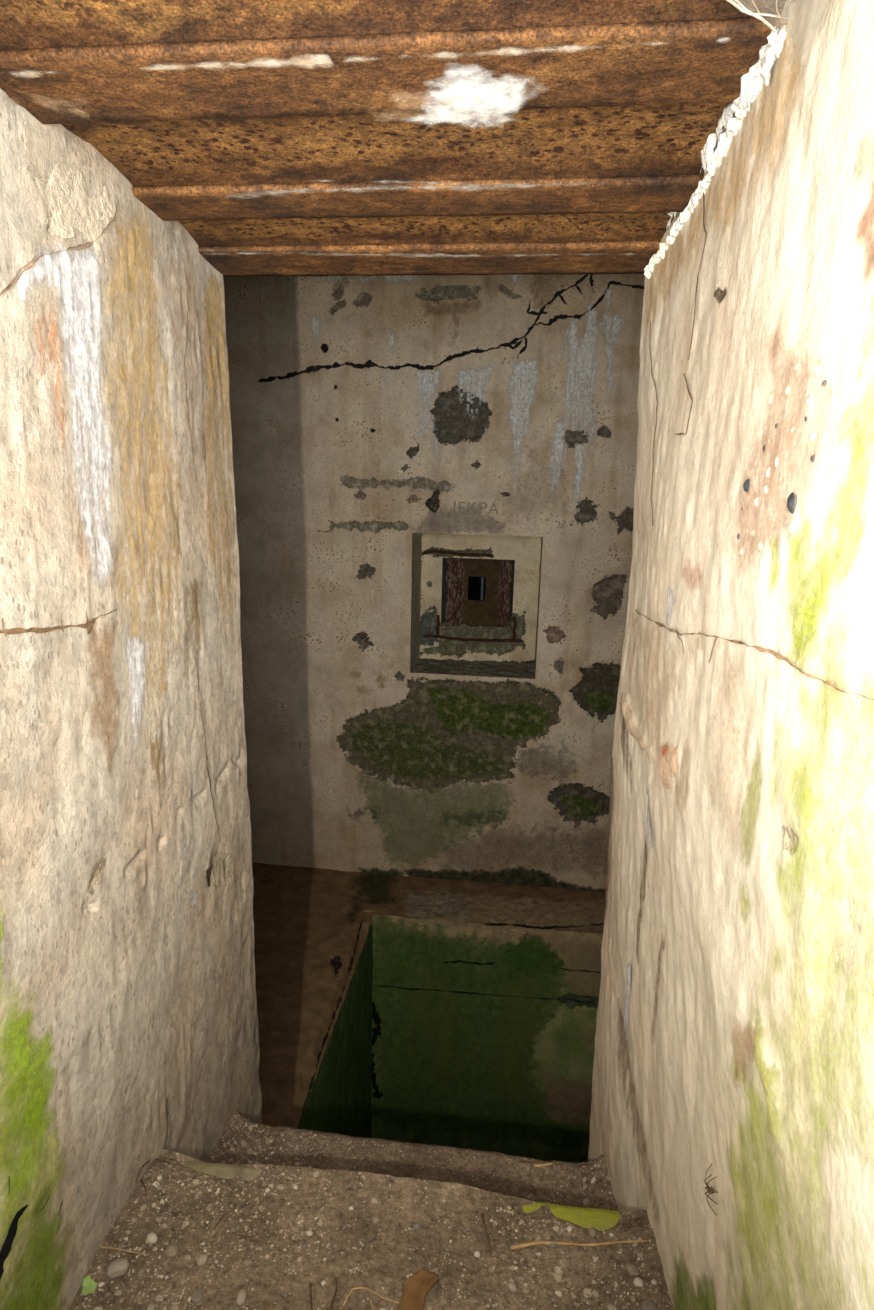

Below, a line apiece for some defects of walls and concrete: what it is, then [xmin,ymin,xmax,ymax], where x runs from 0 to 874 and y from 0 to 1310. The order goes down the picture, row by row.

crack [258,274,644,382]
spalling [429,385,493,446]
leakage [508,357,538,476]
leakage [548,289,624,500]
crack [649,192,707,526]
crack [0,609,117,637]
spalling [420,606,535,664]
spalling [590,574,628,620]
crack [635,610,874,701]
spalling [336,625,621,794]
spalling [547,783,611,828]
crack [0,1176,63,1279]